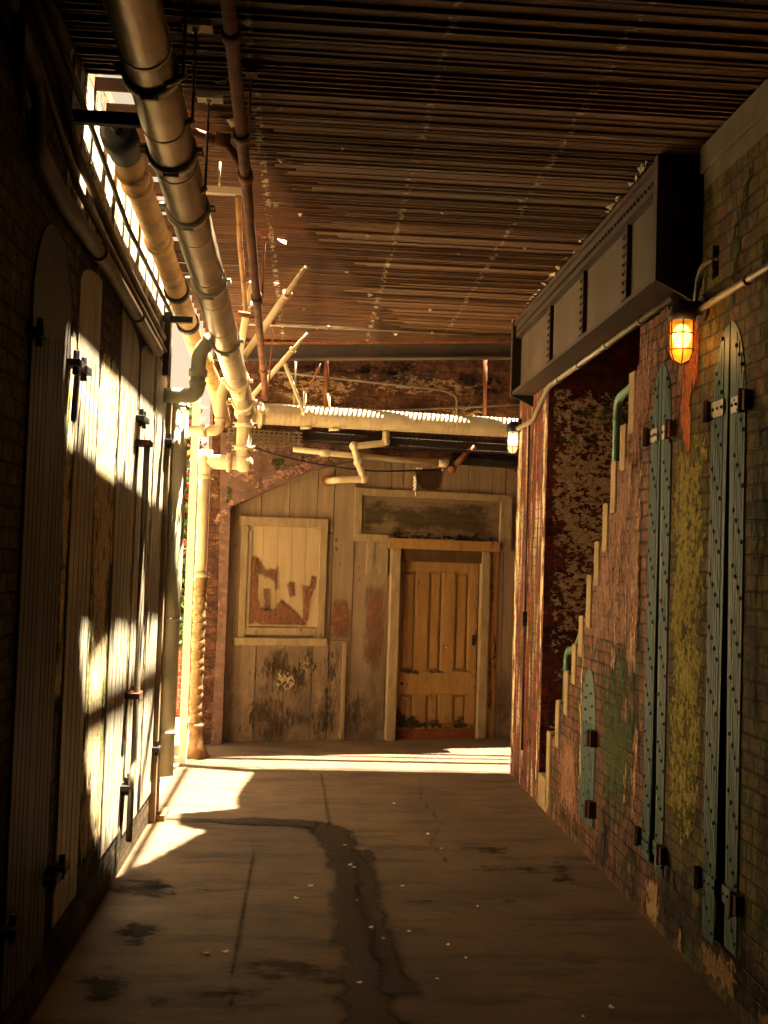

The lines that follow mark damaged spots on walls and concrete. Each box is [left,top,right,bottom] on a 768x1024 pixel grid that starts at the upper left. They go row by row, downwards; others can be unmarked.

rust [680,318,699,453]
peeling [514,431,522,585]
peeling [535,320,670,818]
damp [239,649,379,738]
damp [2,831,175,1021]
damp [165,817,421,1024]